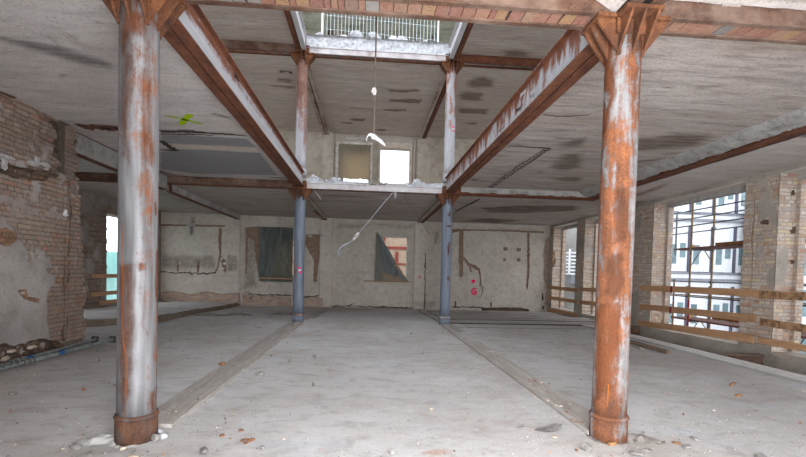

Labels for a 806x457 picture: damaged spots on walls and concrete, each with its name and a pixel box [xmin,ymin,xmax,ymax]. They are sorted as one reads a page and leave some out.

spalling [0,227,19,246]
spalling [305,234,324,283]
corrosion [616,190,626,242]
spalling [0,338,64,363]
corrosion [120,222,133,417]
corrosion [595,255,624,406]